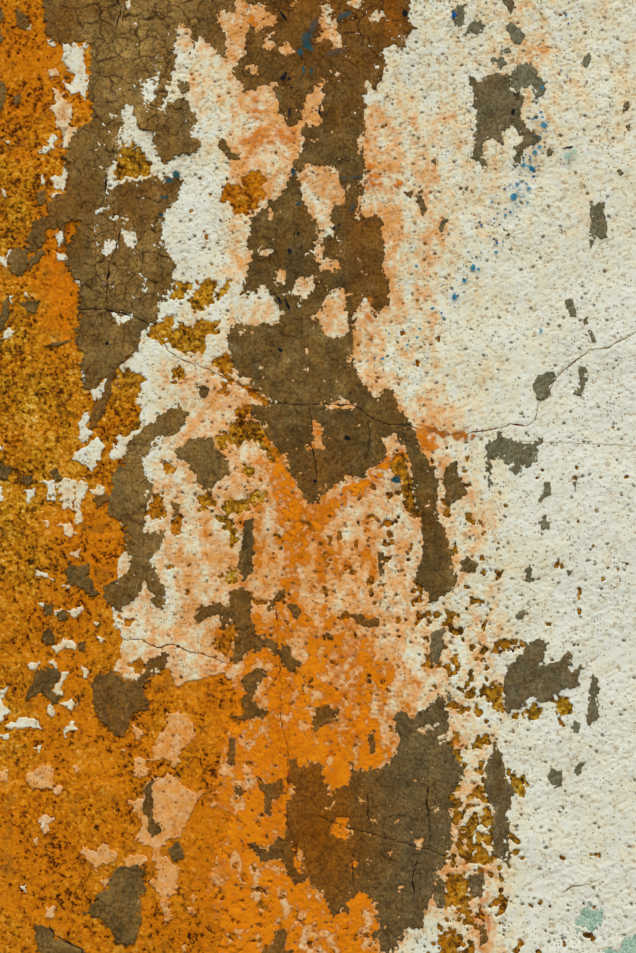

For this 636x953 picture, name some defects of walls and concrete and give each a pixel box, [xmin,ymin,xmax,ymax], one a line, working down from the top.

peeling [466,0,554,170]
rust [47,235,77,348]
crack [79,231,636,485]
flaking render [0,0,486,953]
rust [416,426,476,451]
peeling [484,431,543,487]
rust [189,437,408,953]
peeling [463,636,600,734]
peeling [484,744,529,867]
peeling [547,762,586,789]
peeling [479,923,488,947]
peeling [602,934,636,953]